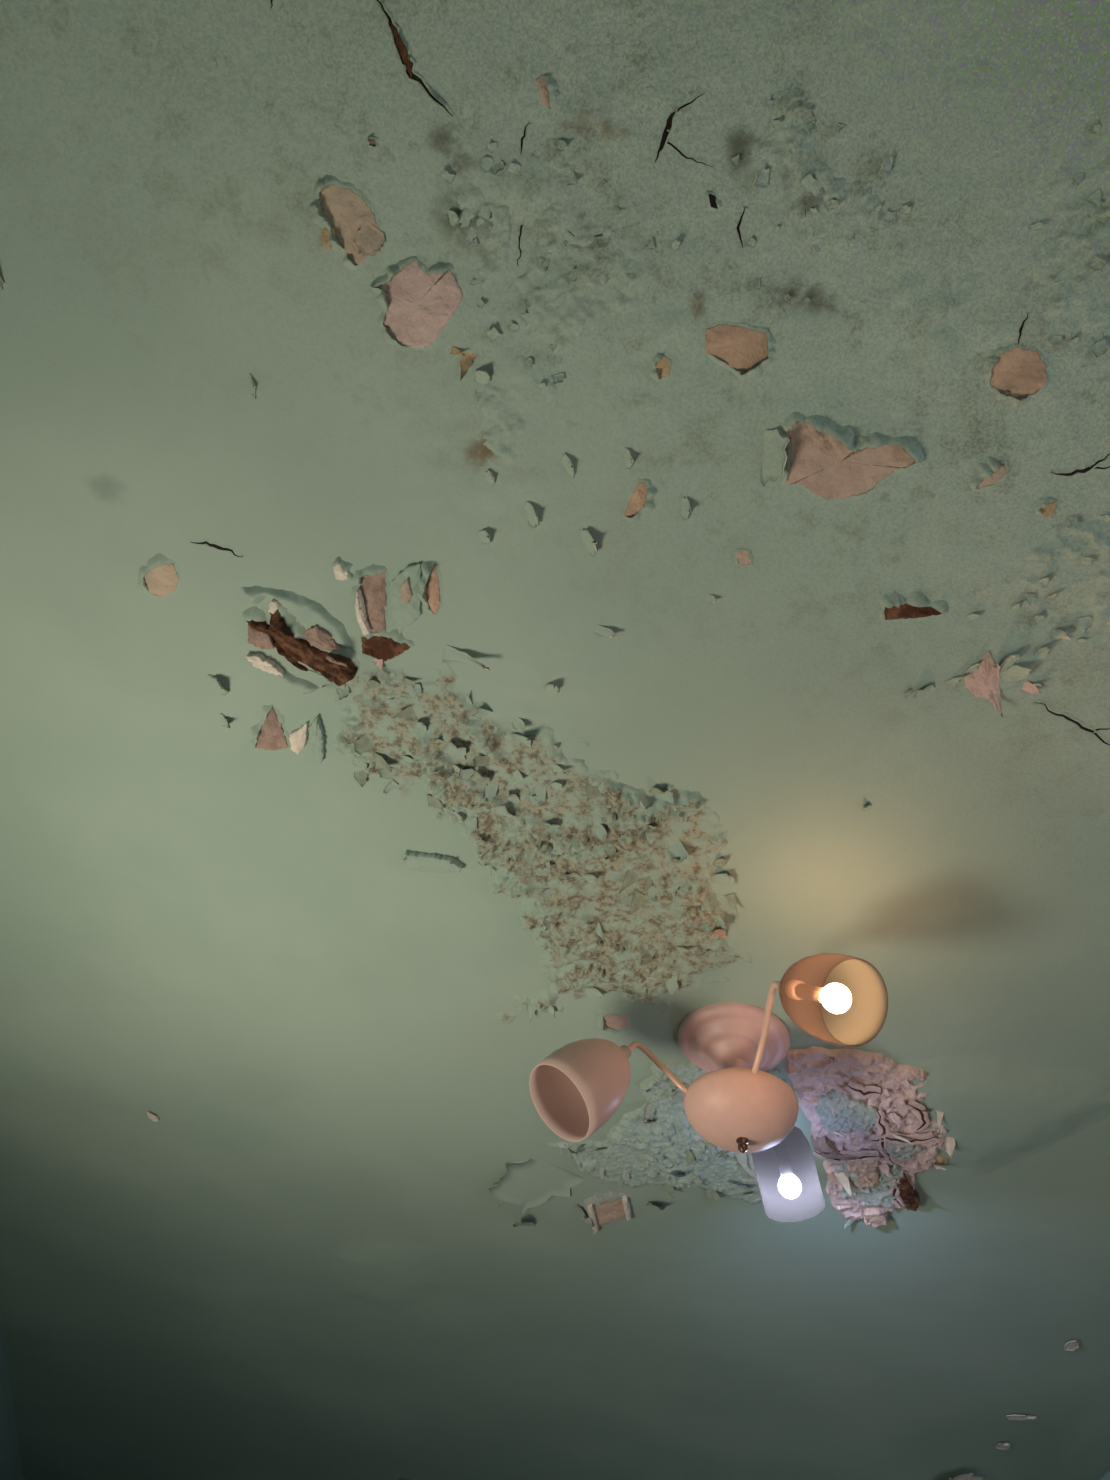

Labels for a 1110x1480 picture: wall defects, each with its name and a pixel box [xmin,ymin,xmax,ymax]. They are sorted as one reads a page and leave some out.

crack [374,0,455,117]
crack [653,92,714,169]
peeling [308,127,680,467]
spalling [702,321,776,381]
spalling [983,343,1050,410]
spalling [761,412,925,503]
crack [190,539,243,559]
peeling [904,629,1071,718]
crack [1034,699,1110,747]
peeling [240,556,753,1034]
peeling [488,1057,762,1234]
spalling [766,1046,955,1228]